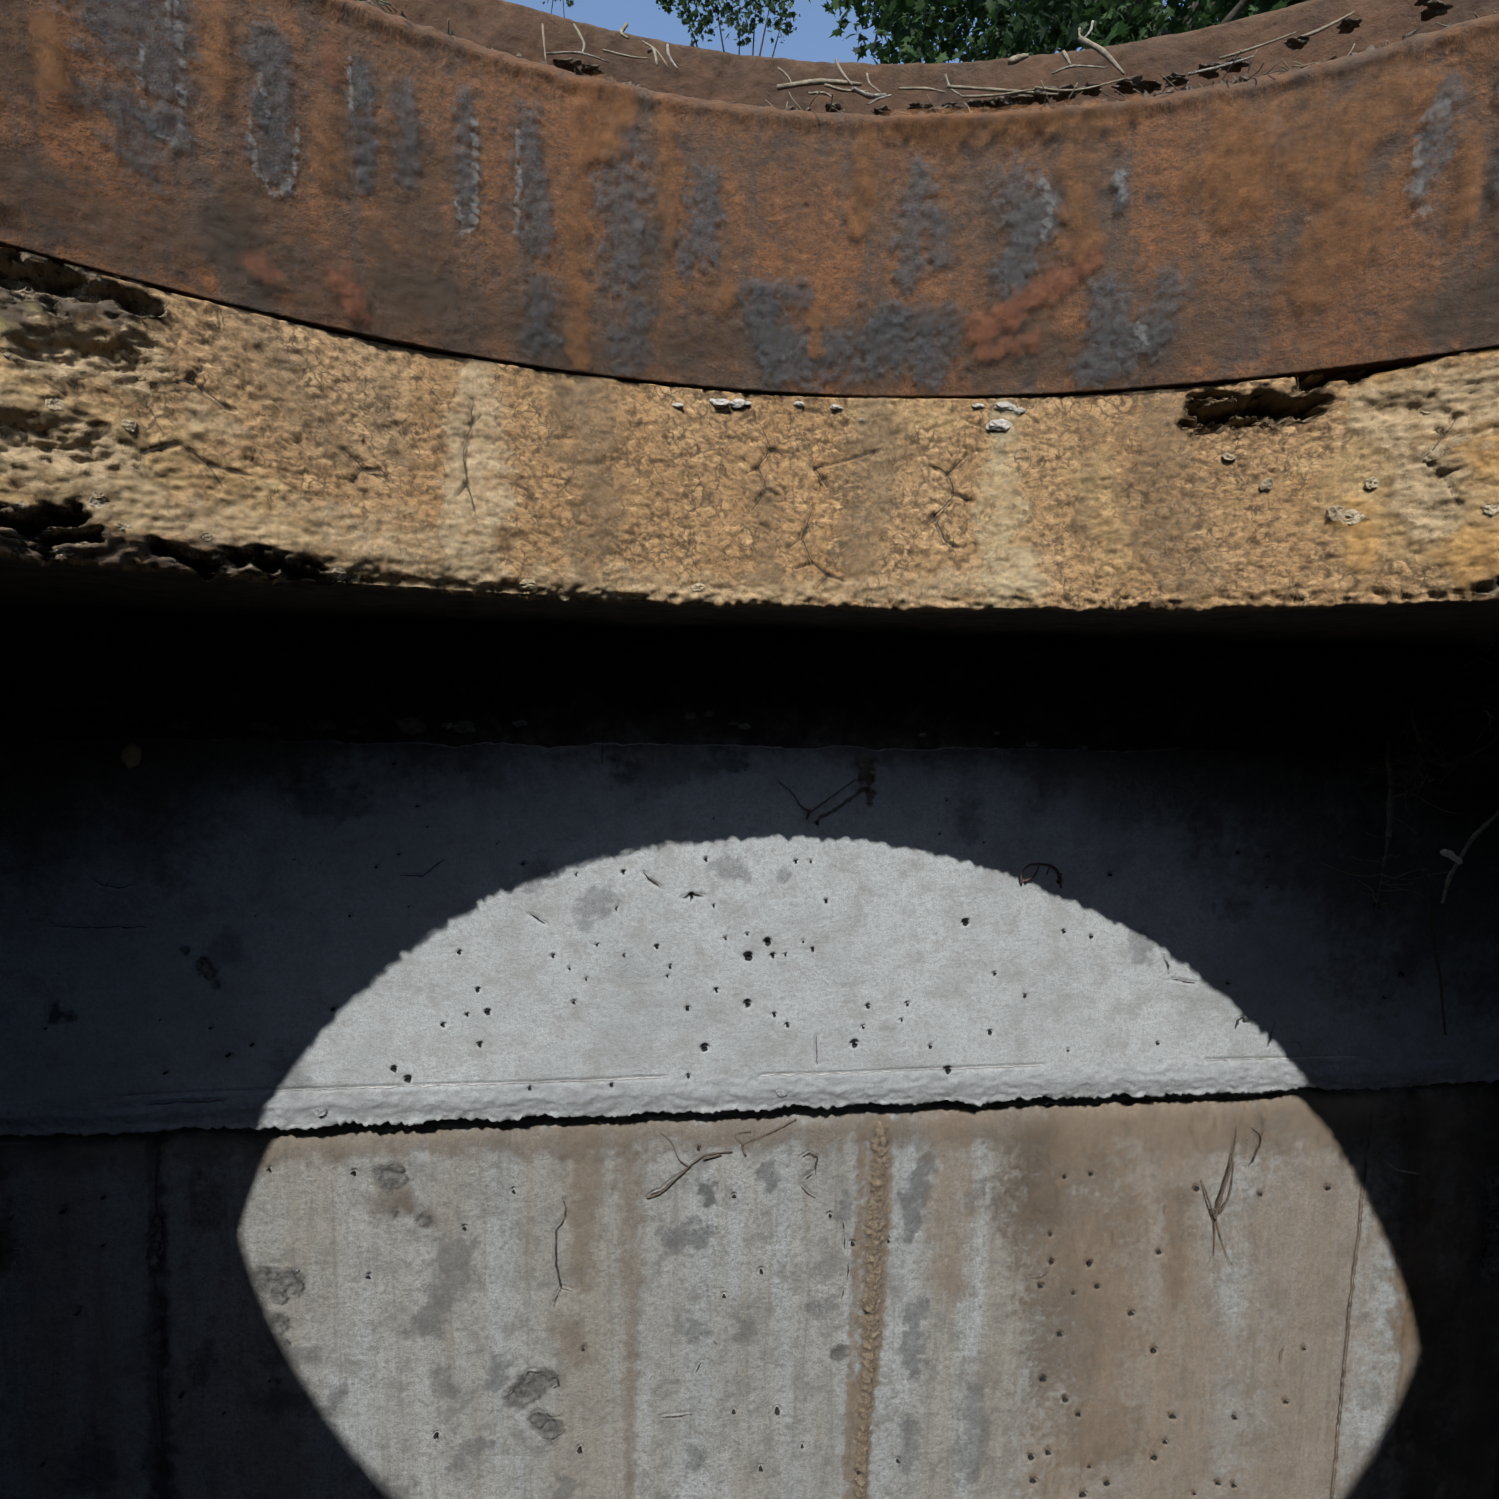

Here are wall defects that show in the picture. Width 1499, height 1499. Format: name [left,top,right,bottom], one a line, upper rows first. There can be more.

rust [889,97,1139,161]
peeling [0,247,175,393]
rust [969,235,1102,358]
peeling [0,398,142,559]
spalling [148,532,650,601]
crack [747,427,876,591]
crack [925,455,972,547]
peeling [1177,359,1499,538]
rust [1443,409,1499,473]